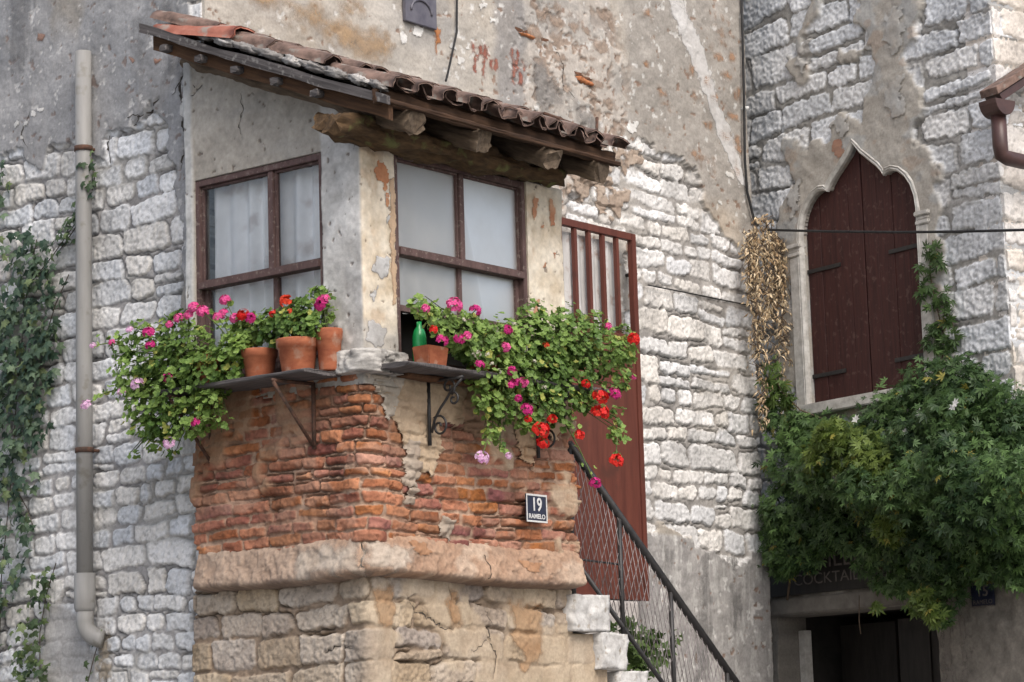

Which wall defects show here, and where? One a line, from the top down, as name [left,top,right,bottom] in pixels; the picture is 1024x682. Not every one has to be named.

flaking render [515,0,614,61]
flaking render [794,37,813,75]
crack [127,76,202,167]
flaking render [548,71,613,110]
flaking render [829,114,849,158]
flaking render [566,120,644,221]
flaking render [370,160,397,305]
flaking render [366,373,469,505]
flaking render [513,400,566,468]
flaking render [438,515,457,541]
crack [471,612,497,677]